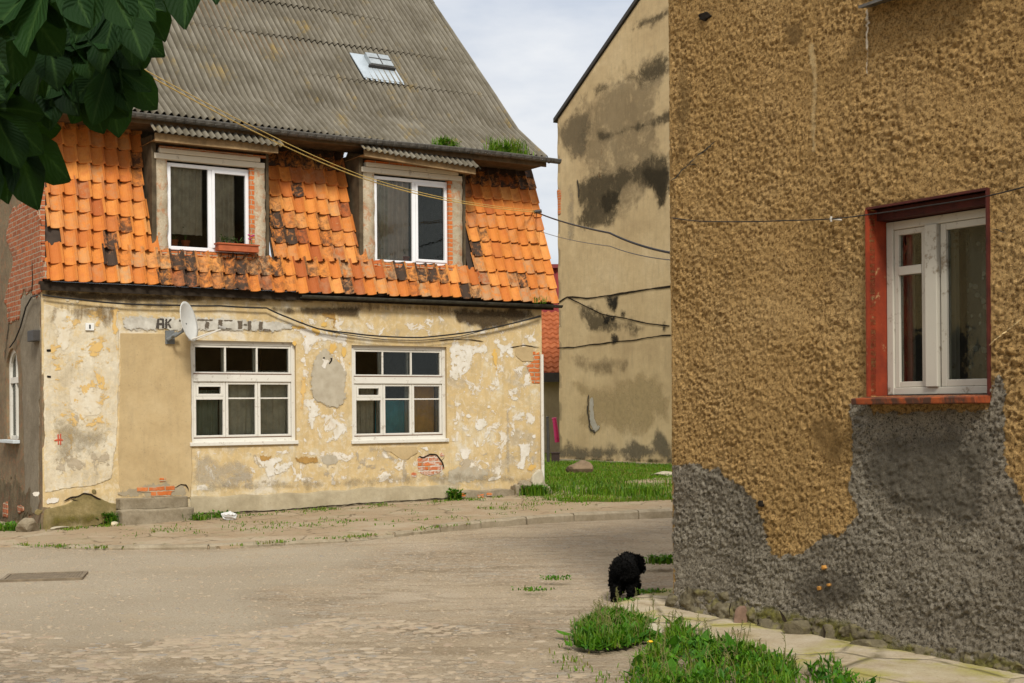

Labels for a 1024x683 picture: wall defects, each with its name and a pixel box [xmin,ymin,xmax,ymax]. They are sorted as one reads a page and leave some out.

water stain [640,57,668,82]
water stain [561,113,610,158]
water stain [635,112,669,130]
water stain [579,155,669,226]
peeling [0,202,120,523]
peeling [118,316,552,498]